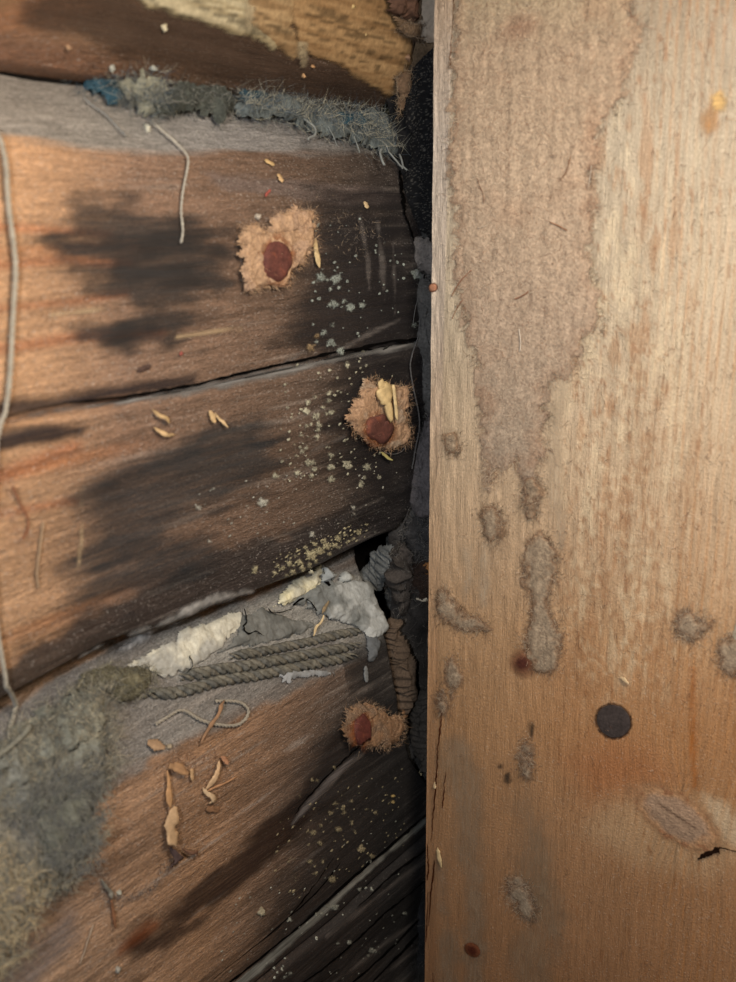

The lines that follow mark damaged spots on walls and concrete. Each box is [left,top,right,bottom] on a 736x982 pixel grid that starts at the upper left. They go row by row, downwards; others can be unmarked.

crack [698,847,736,860]